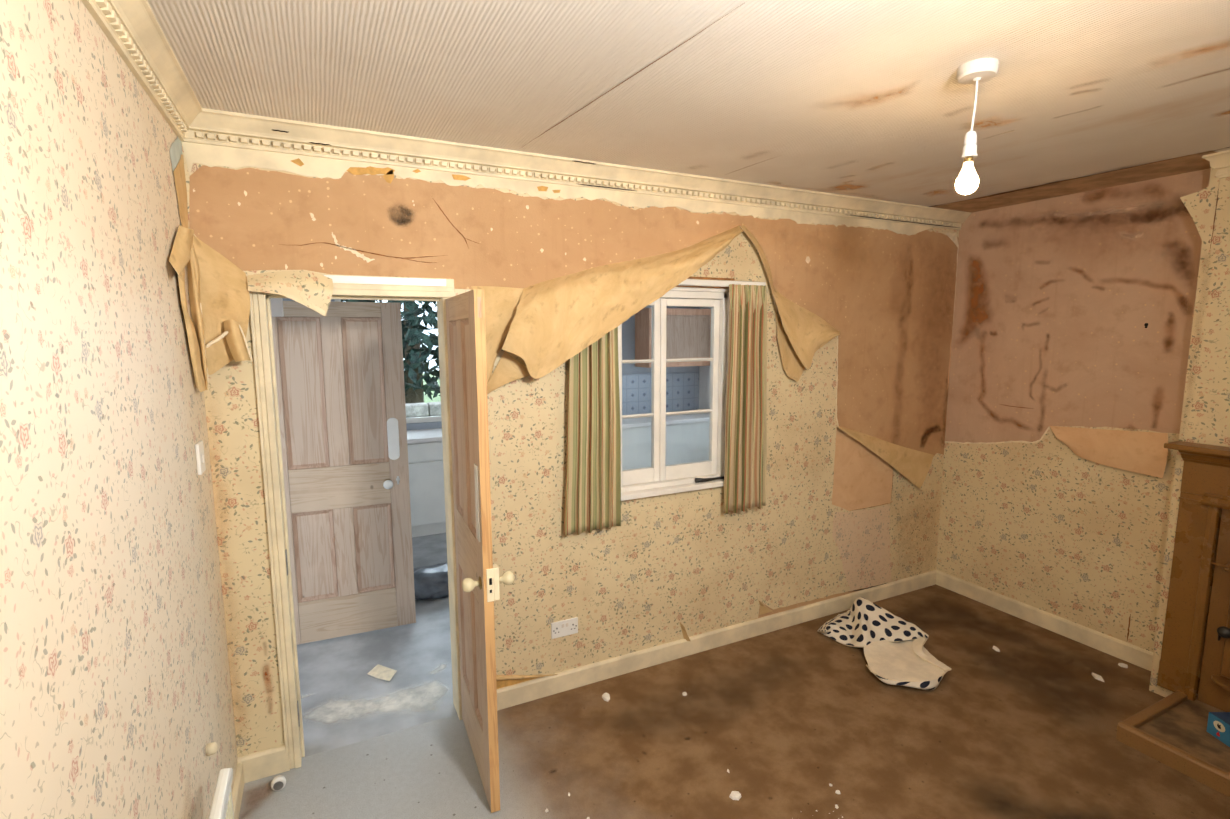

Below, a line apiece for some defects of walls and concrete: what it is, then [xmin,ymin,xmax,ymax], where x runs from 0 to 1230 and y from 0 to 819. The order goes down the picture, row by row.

crack [279,197,479,263]
peeling [169,136,1219,511]
water stain [965,260,996,337]